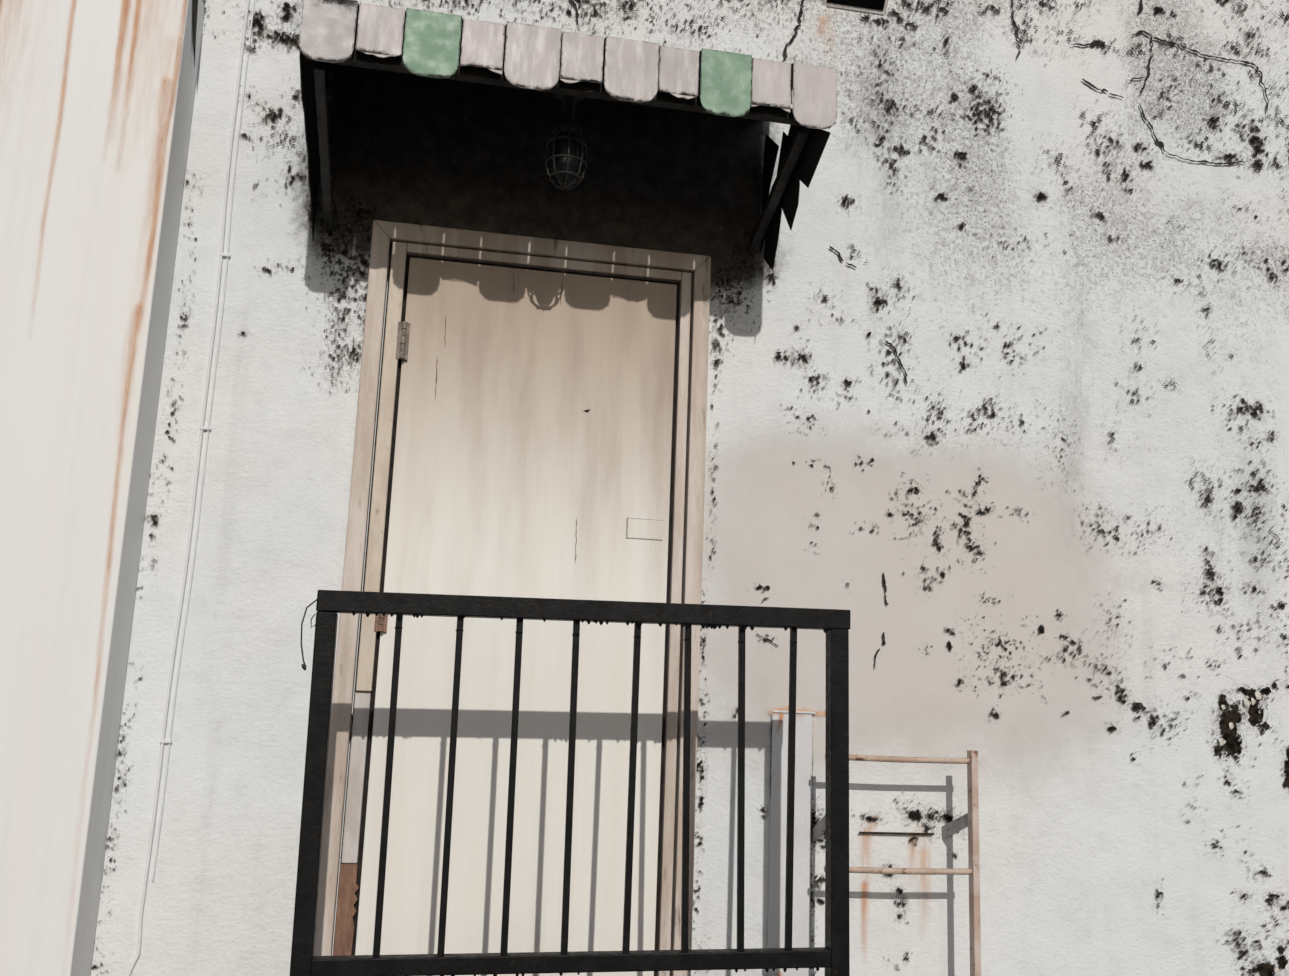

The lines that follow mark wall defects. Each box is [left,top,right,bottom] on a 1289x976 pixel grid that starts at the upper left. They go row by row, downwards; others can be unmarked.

corrosion [115,0,140,73]
leakage [203,1,300,52]
leakage [424,0,818,51]
crack [783,0,805,60]
leakage [842,0,1014,196]
leakage [975,0,1289,221]
crack [1072,0,1269,165]
corrosion [147,174,160,266]
leakage [240,63,777,408]
leakage [706,267,1194,750]
leakage [1163,394,1289,678]
leakage [695,626,826,811]